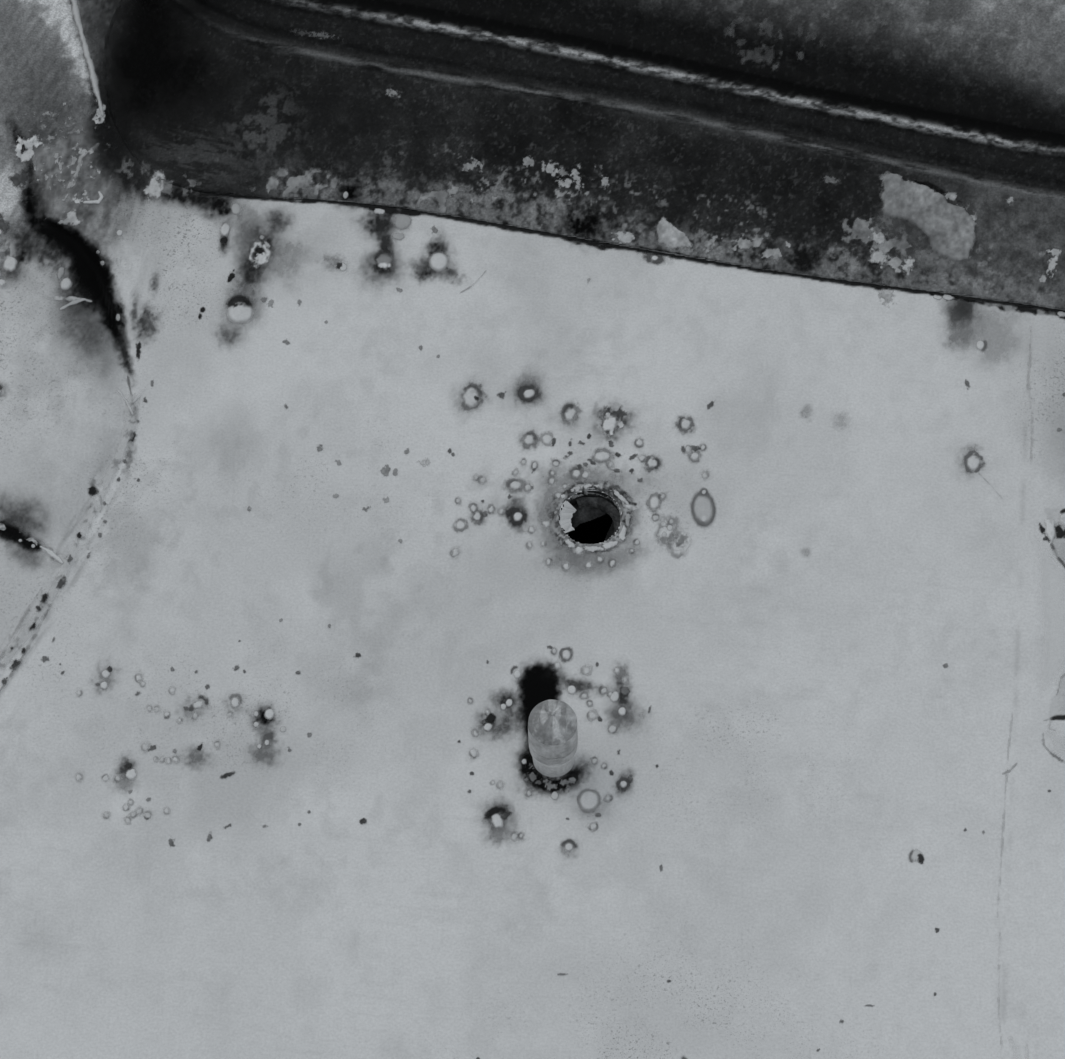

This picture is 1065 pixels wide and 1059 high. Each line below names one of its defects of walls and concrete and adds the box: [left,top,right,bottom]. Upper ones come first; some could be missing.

peeling [868,173,976,276]
crack [1050,713,1065,721]